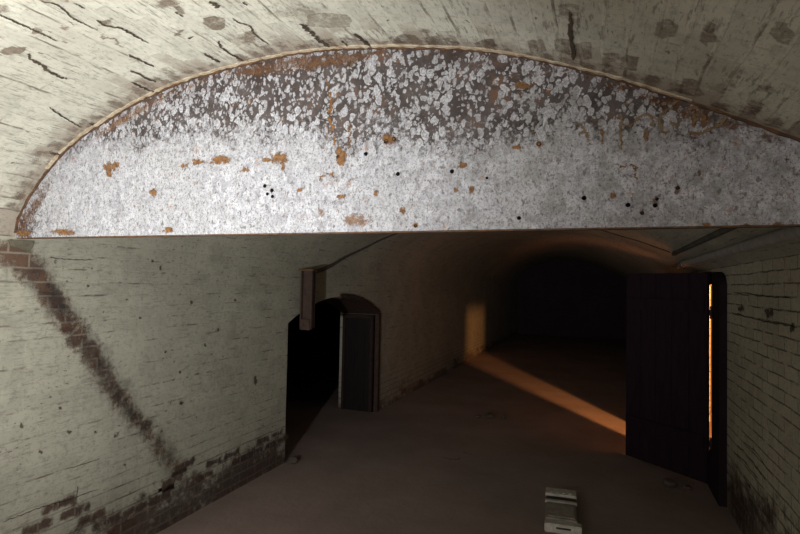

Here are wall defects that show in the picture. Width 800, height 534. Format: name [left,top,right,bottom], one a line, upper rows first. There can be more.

crack [0,15,56,41]
crack [27,54,67,79]
crack [44,2,156,92]
crack [204,41,244,63]
crack [209,1,269,45]
crack [567,12,576,61]
rust [14,47,800,237]
peeling [0,240,288,534]